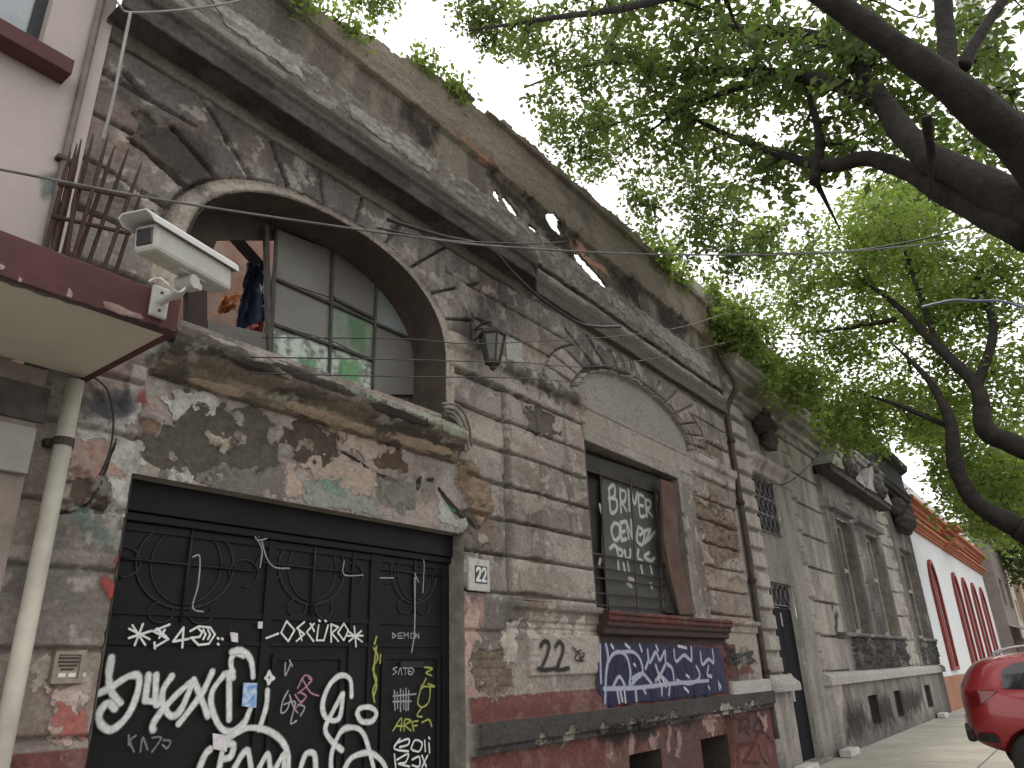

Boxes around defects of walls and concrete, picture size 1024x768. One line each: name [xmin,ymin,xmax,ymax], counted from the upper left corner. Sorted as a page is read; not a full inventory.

leakage [401,107,439,148]
leakage [486,164,577,258]
flaking render [569,238,610,278]
leakage [652,295,689,338]
peeling [61,428,125,514]
peeling [133,378,456,499]
flaking render [468,615,586,705]
peeling [29,653,90,759]
leakage [846,691,921,744]